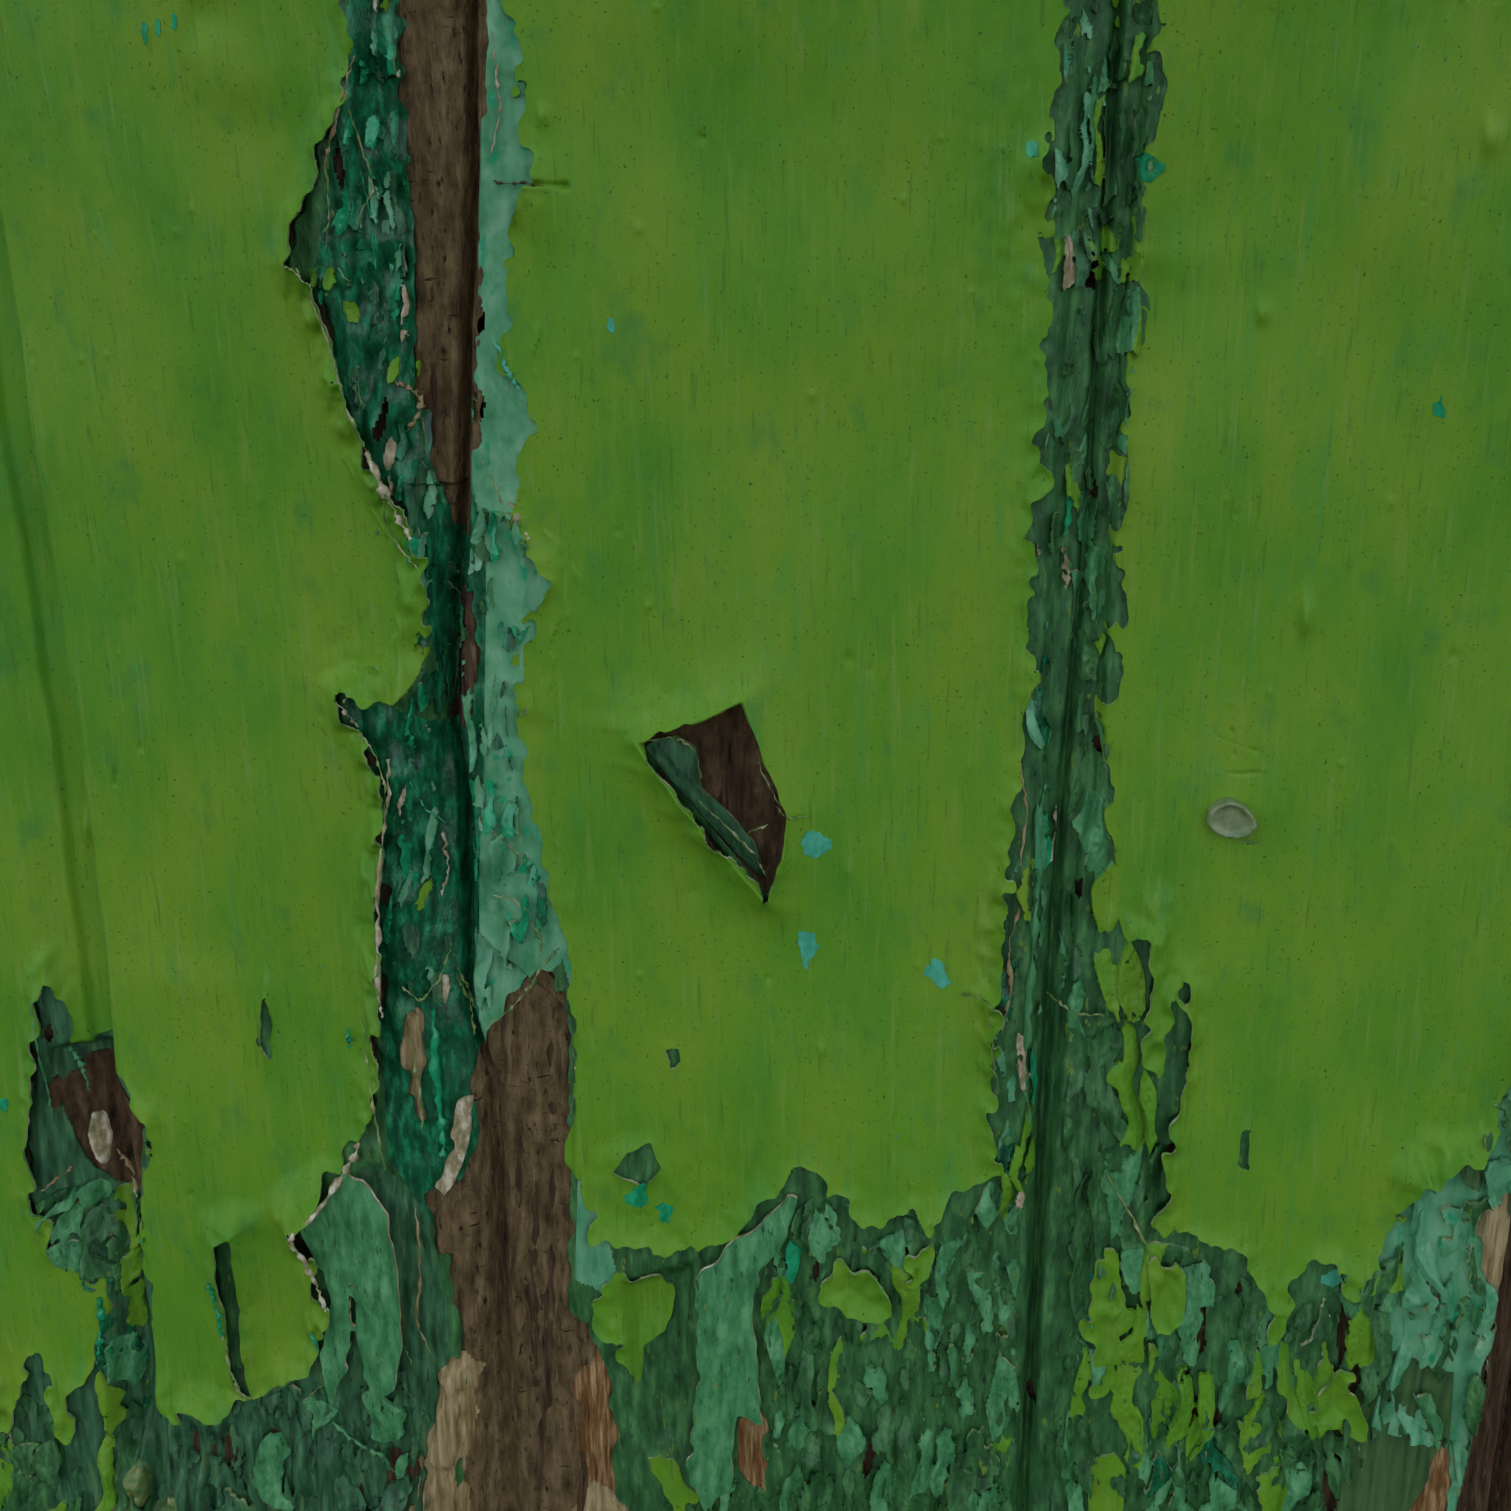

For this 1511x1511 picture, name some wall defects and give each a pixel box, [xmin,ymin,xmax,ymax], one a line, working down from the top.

peeling [0,926,149,1511]
peeling [95,0,806,1511]